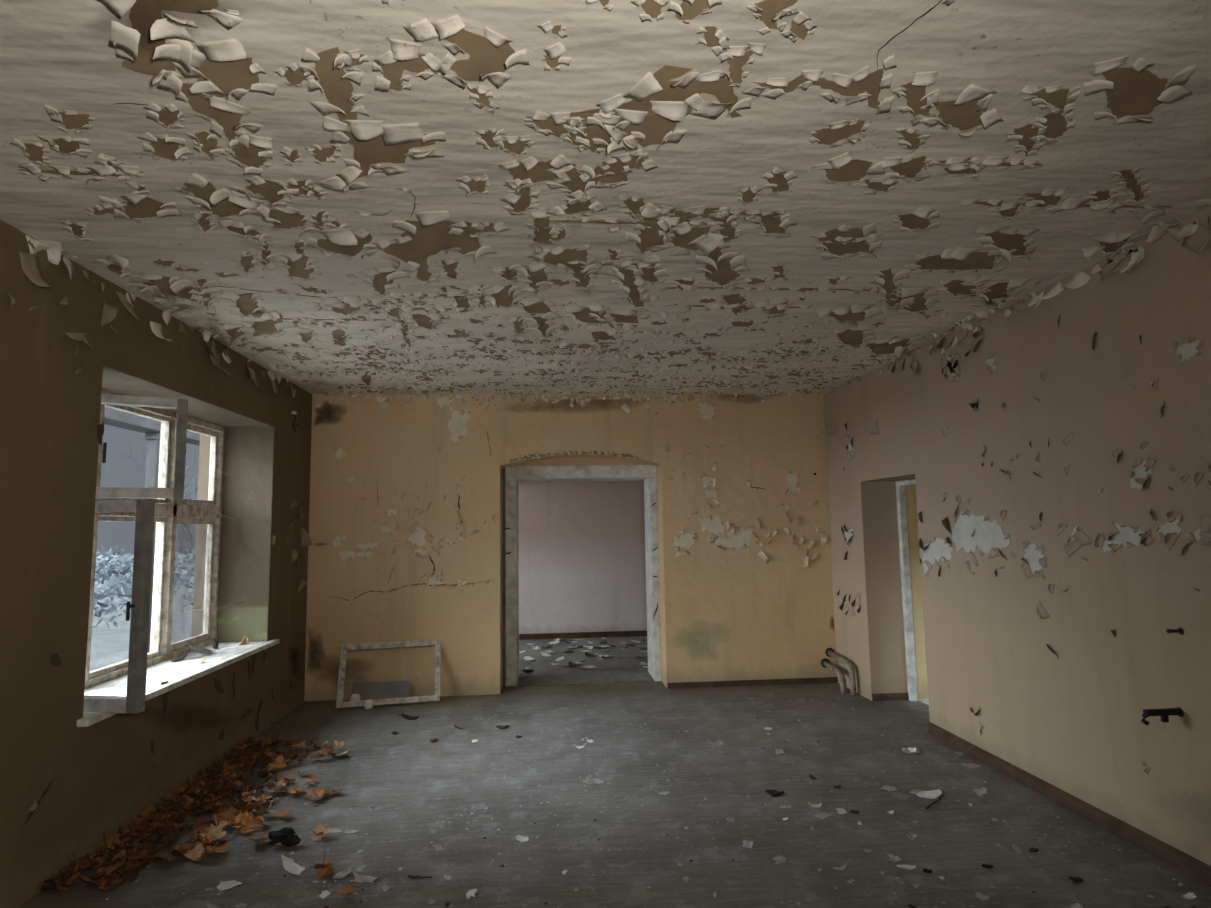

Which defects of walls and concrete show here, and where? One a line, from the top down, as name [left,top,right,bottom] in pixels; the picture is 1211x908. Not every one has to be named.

crack [877,0,955,70]
peeling [10,0,1211,442]
peeling [1112,441,1211,491]
crack [329,528,512,604]
peeling [673,463,827,567]
peeling [841,525,854,560]
peeling [918,492,1068,619]
peeling [1057,509,1186,561]